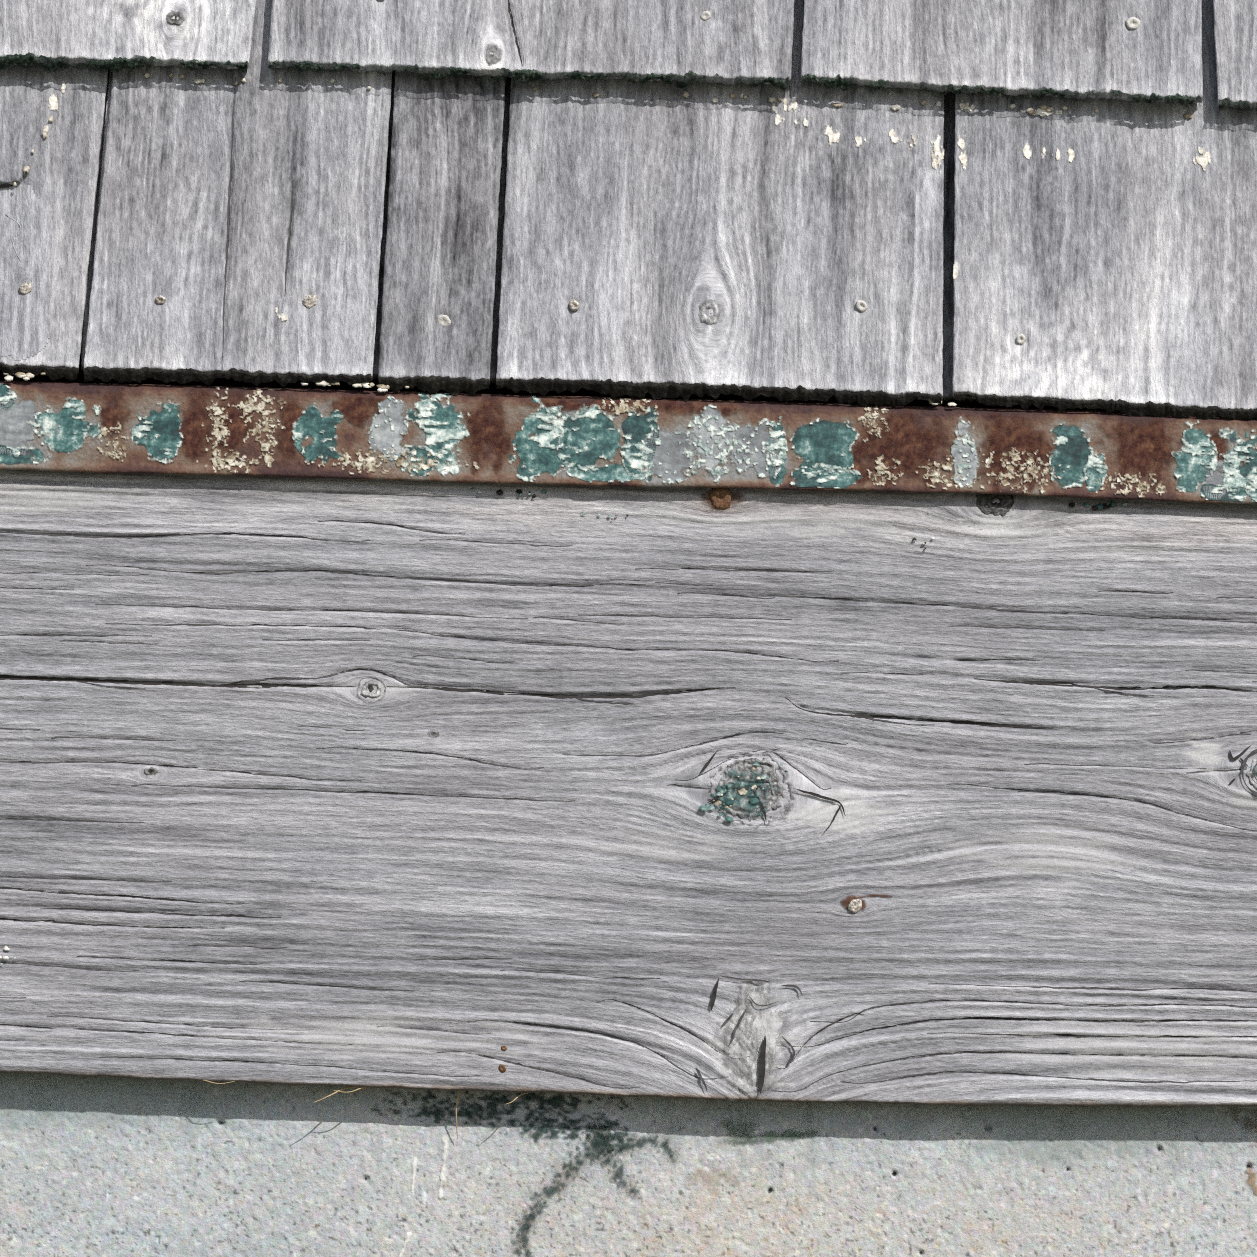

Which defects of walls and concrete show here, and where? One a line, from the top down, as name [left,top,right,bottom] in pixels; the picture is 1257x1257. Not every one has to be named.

peeling [931,134,944,172]
peeling [1023,143,1075,162]
spalling [0,82,183,465]
rust [178,391,253,458]
peeling [496,396,1257,511]
rust [852,413,947,489]
rust [982,414,1055,492]
crack [0,520,1257,704]
crack [297,697,1053,832]
crack [0,876,411,991]
crack [0,958,1257,1093]
leakage [374,1090,673,1257]